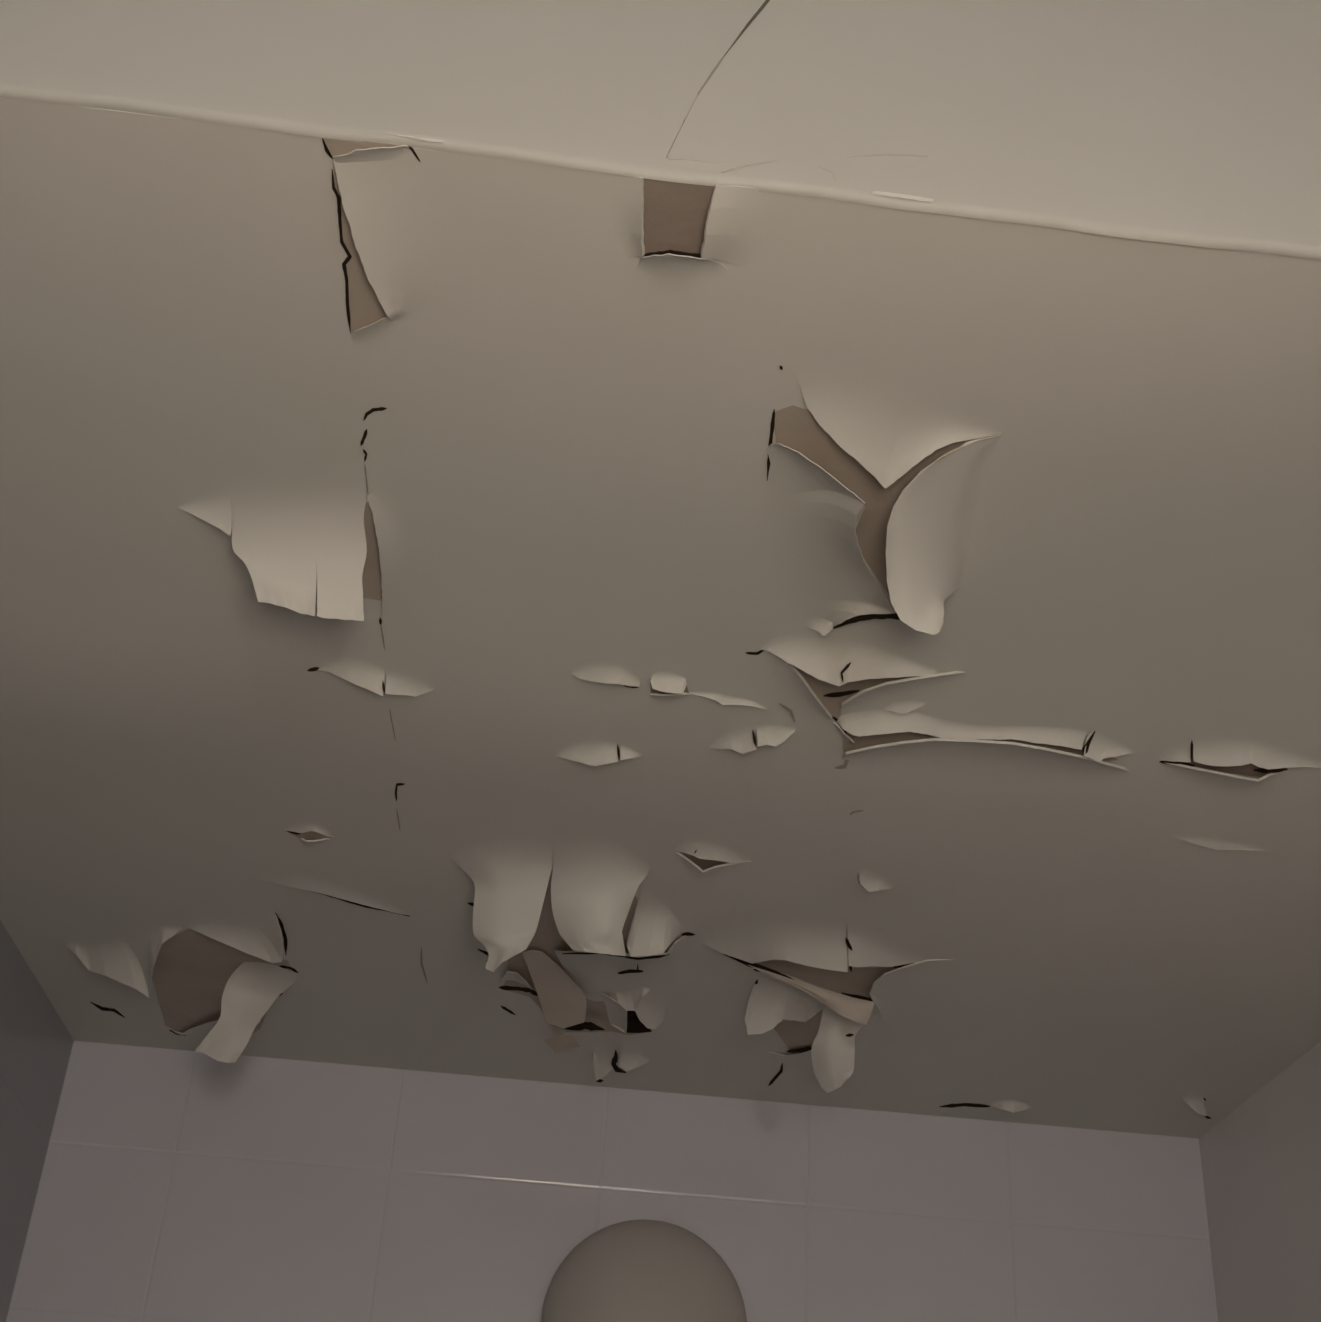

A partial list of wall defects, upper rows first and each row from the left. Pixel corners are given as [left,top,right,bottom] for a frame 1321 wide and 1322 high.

peeling [322,133,455,349]
peeling [611,176,786,292]
crack [360,407,387,494]
peeling [178,471,425,650]
peeling [571,366,1136,785]
peeling [307,655,435,697]
crack [395,783,405,829]
peeling [556,739,642,766]
peeling [1158,735,1321,805]
peeling [66,907,299,1063]
peeling [450,836,961,1093]